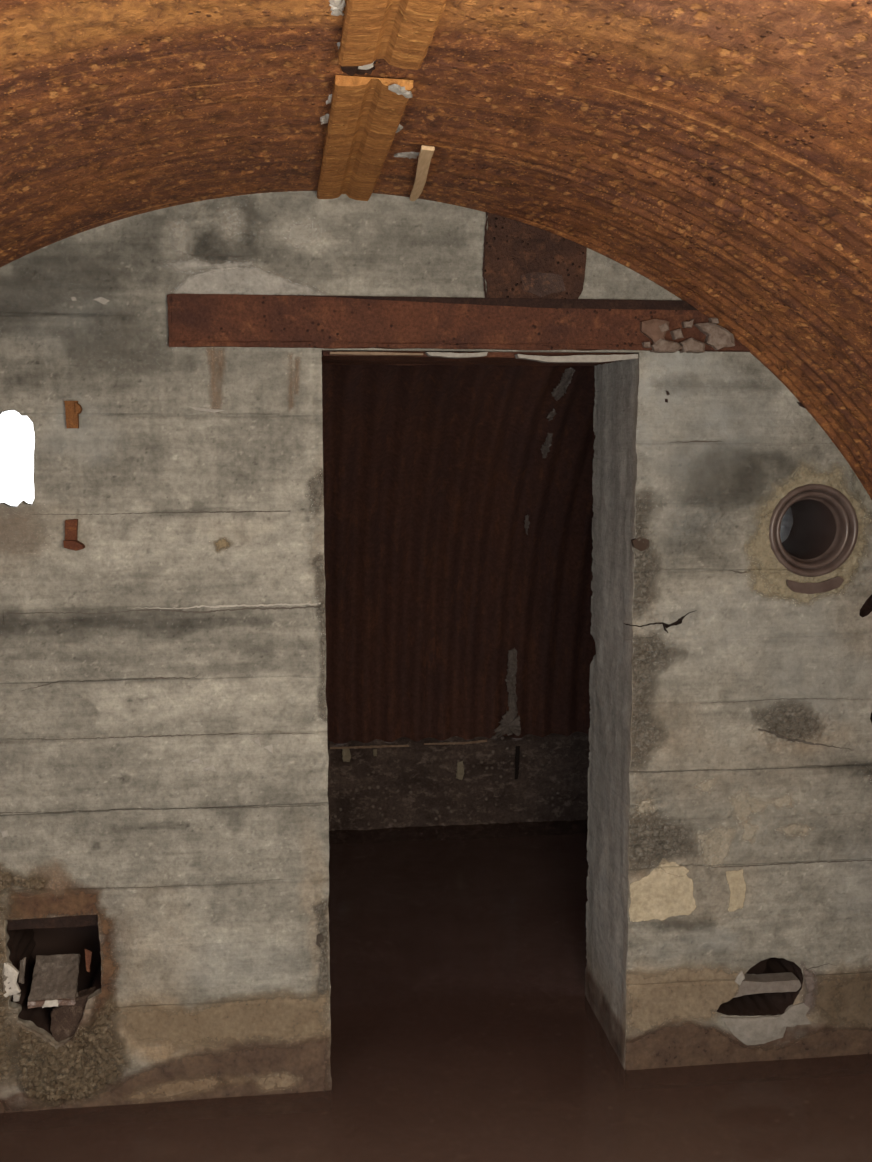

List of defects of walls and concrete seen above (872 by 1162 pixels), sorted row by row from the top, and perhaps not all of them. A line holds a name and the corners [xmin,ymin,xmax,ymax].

crack [624,610,697,640]
spalling [859,595,872,617]
peeling [699,791,791,912]
spalling [0,865,46,892]
peeling [629,858,696,922]
flaking render [2,962,21,1002]
spalling [14,998,128,1107]